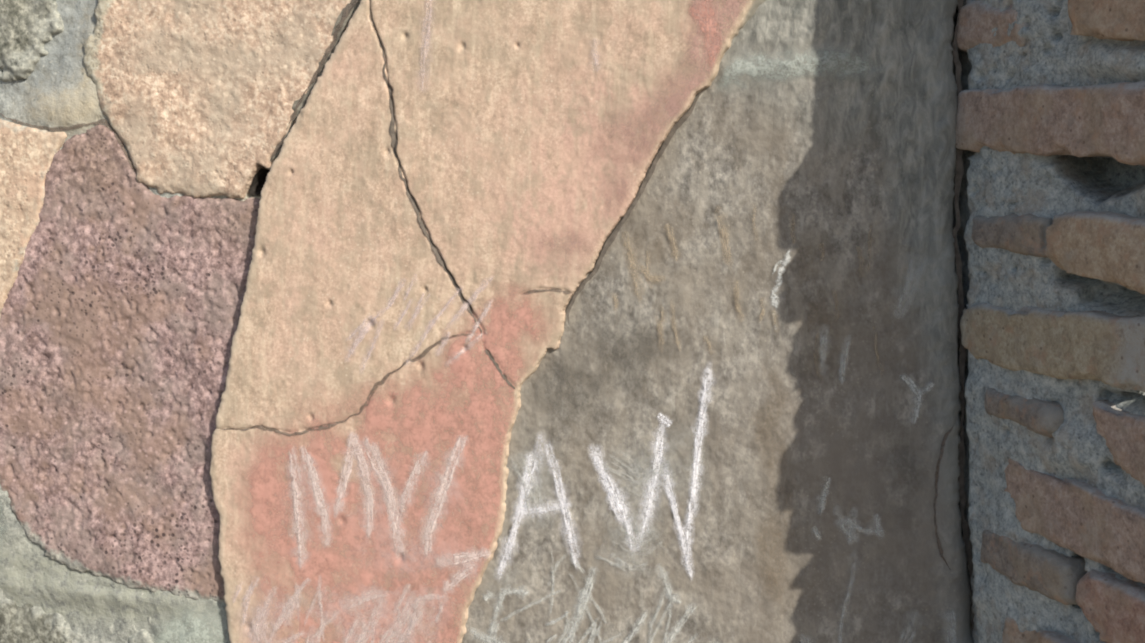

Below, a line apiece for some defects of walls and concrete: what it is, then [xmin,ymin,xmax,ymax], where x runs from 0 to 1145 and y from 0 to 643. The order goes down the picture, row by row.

crack [221,0,515,436]